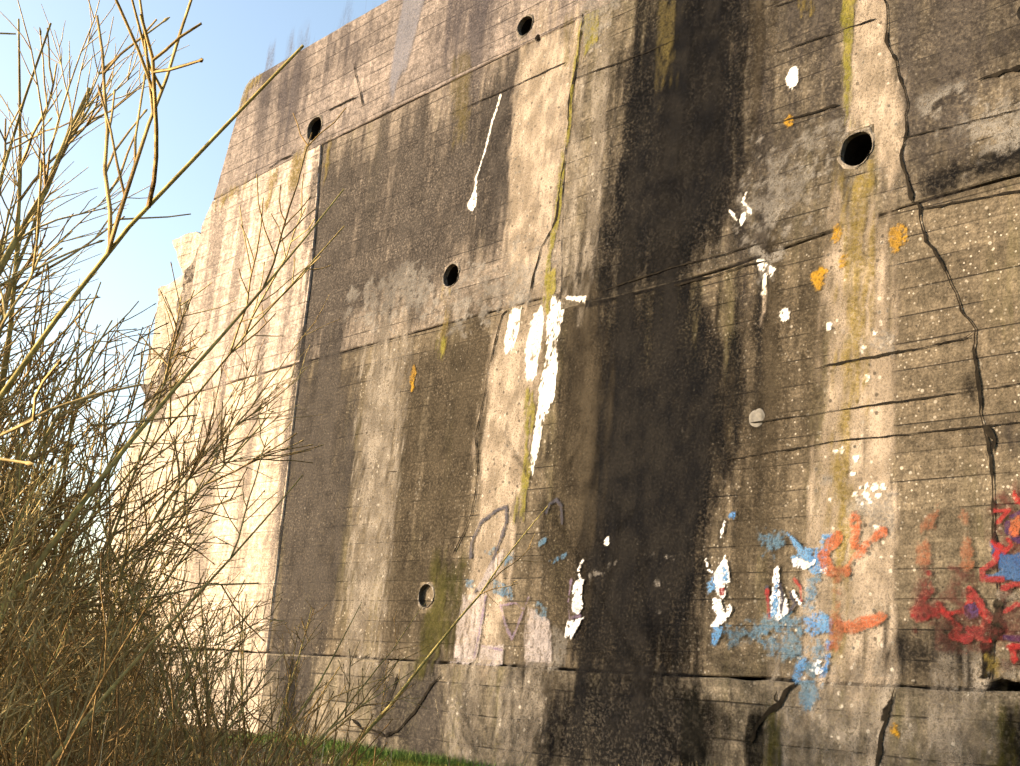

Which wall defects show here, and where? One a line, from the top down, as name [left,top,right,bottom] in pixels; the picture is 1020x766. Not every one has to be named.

damp [191,333,234,595]
damp [205,190,250,328]
damp [258,0,1020,766]
crack [884,0,999,594]
crack [750,681,799,743]
crack [875,688,895,766]